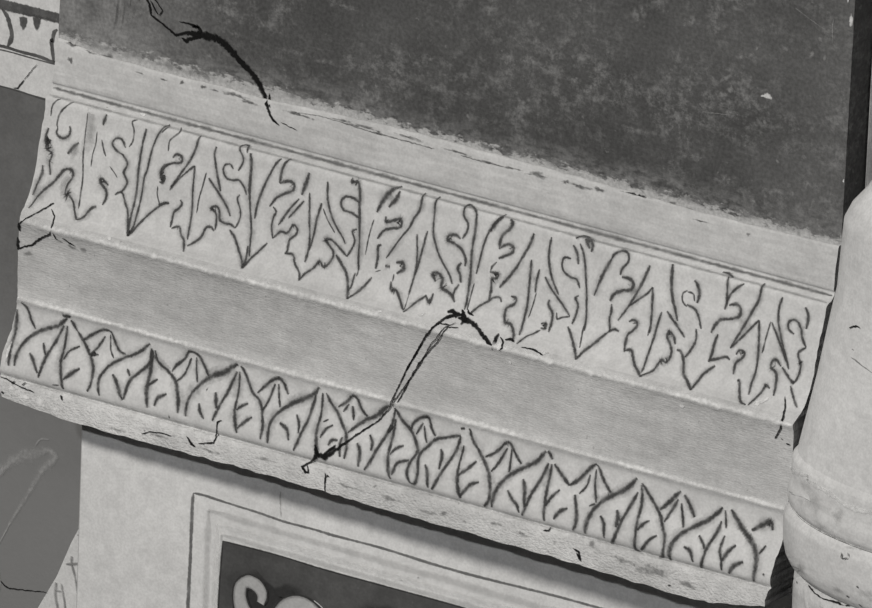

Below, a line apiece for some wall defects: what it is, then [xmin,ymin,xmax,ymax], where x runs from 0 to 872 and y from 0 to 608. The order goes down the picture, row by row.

crack [146,0,296,130]
crack [16,203,74,250]
crack [301,309,542,492]